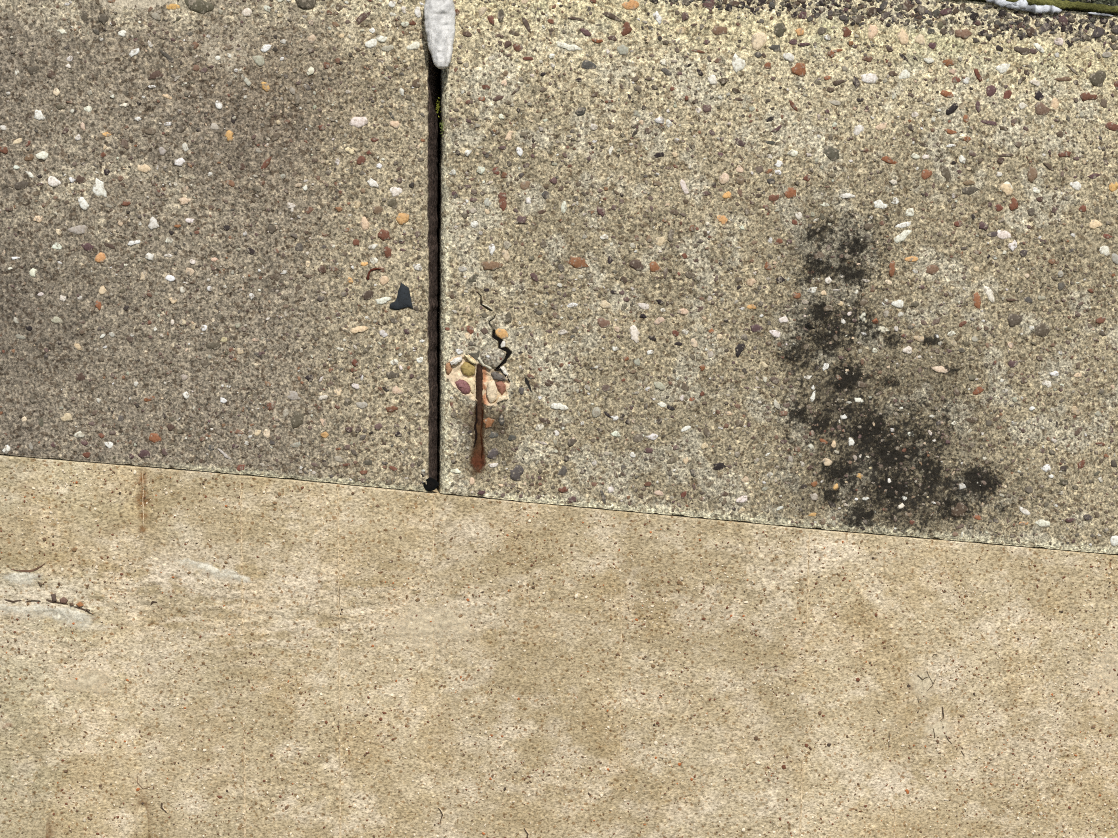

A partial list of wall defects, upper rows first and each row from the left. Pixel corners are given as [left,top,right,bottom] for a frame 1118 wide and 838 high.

crack [476,291,512,383]
mould [773,200,1008,535]
corrosion [471,400,485,474]